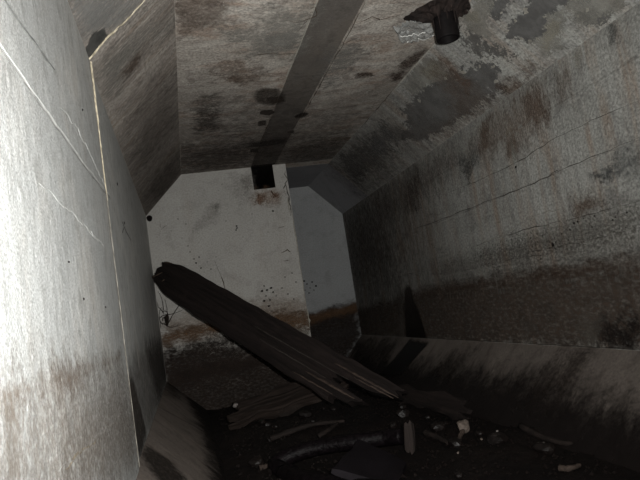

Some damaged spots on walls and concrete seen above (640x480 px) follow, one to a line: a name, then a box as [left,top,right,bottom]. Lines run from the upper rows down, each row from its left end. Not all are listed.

crack [0,47,110,198]
water stain [255,88,284,126]
water stain [392,49,429,81]
crack [415,138,637,229]
water stain [129,323,298,480]
water stain [271,257,640,473]